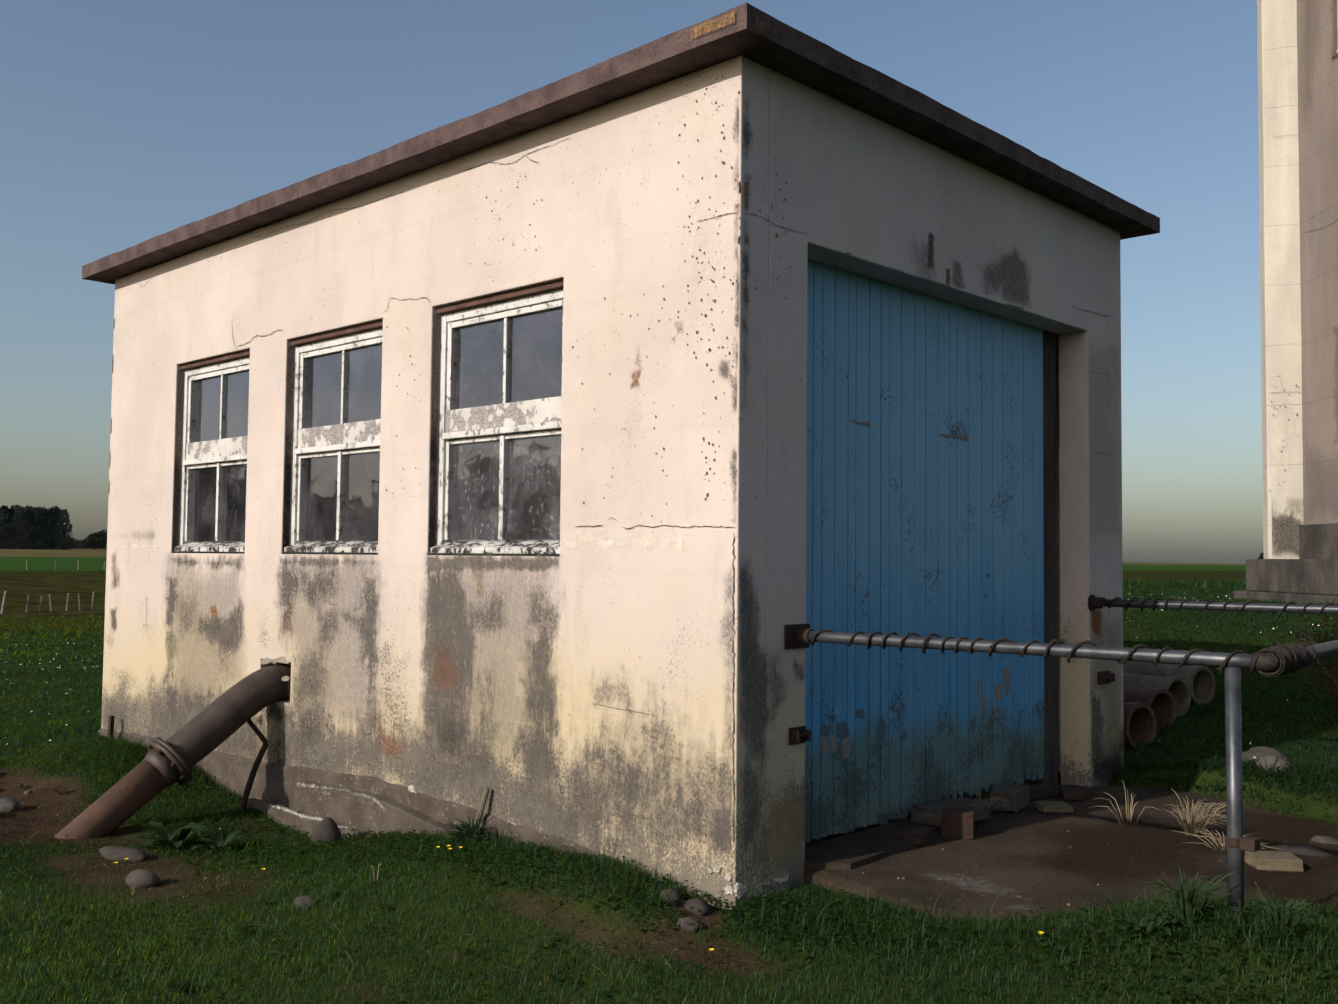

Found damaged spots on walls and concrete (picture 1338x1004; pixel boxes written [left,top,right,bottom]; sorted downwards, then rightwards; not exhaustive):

crack [463,137,571,171]
leakage [735,254,749,326]
leakage [928,234,963,287]
leakage [103,370,243,739]
leakage [215,314,781,852]
crack [576,517,736,846]
peeling [819,703,908,760]
peeling [970,667,1010,734]